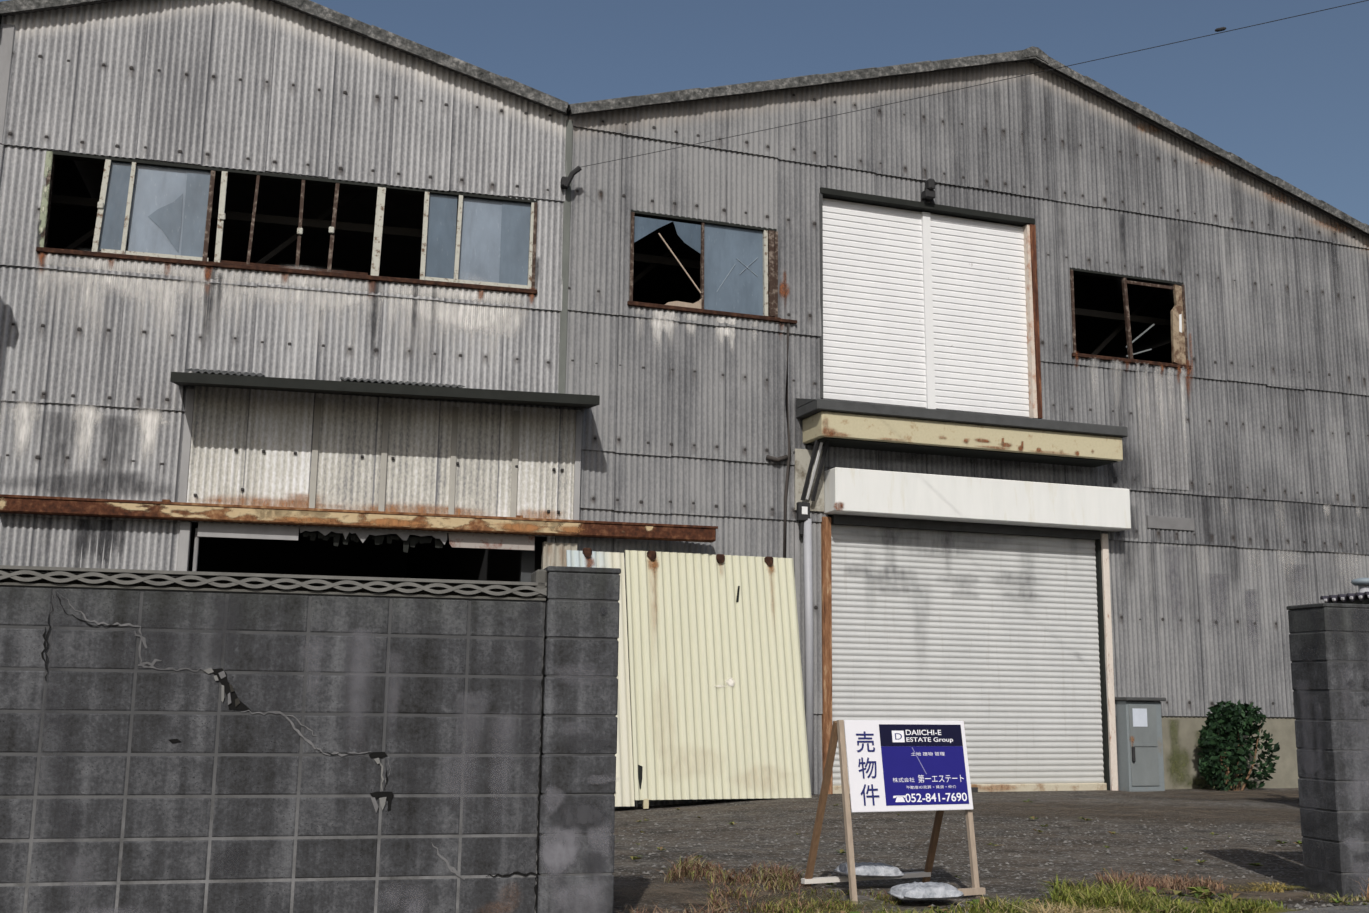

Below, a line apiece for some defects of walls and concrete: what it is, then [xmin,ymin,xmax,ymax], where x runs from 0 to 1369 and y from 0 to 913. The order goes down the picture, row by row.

damp [637,309,696,340]
damp [718,317,735,347]
damp [12,402,38,451]
damp [62,405,166,457]
rust [964,438,1093,456]
damp [77,519,122,568]
rust [216,495,328,522]
rust [367,505,462,526]
rust [503,512,550,532]
crack [41,593,205,681]
crack [241,710,391,791]
crack [432,619,545,913]